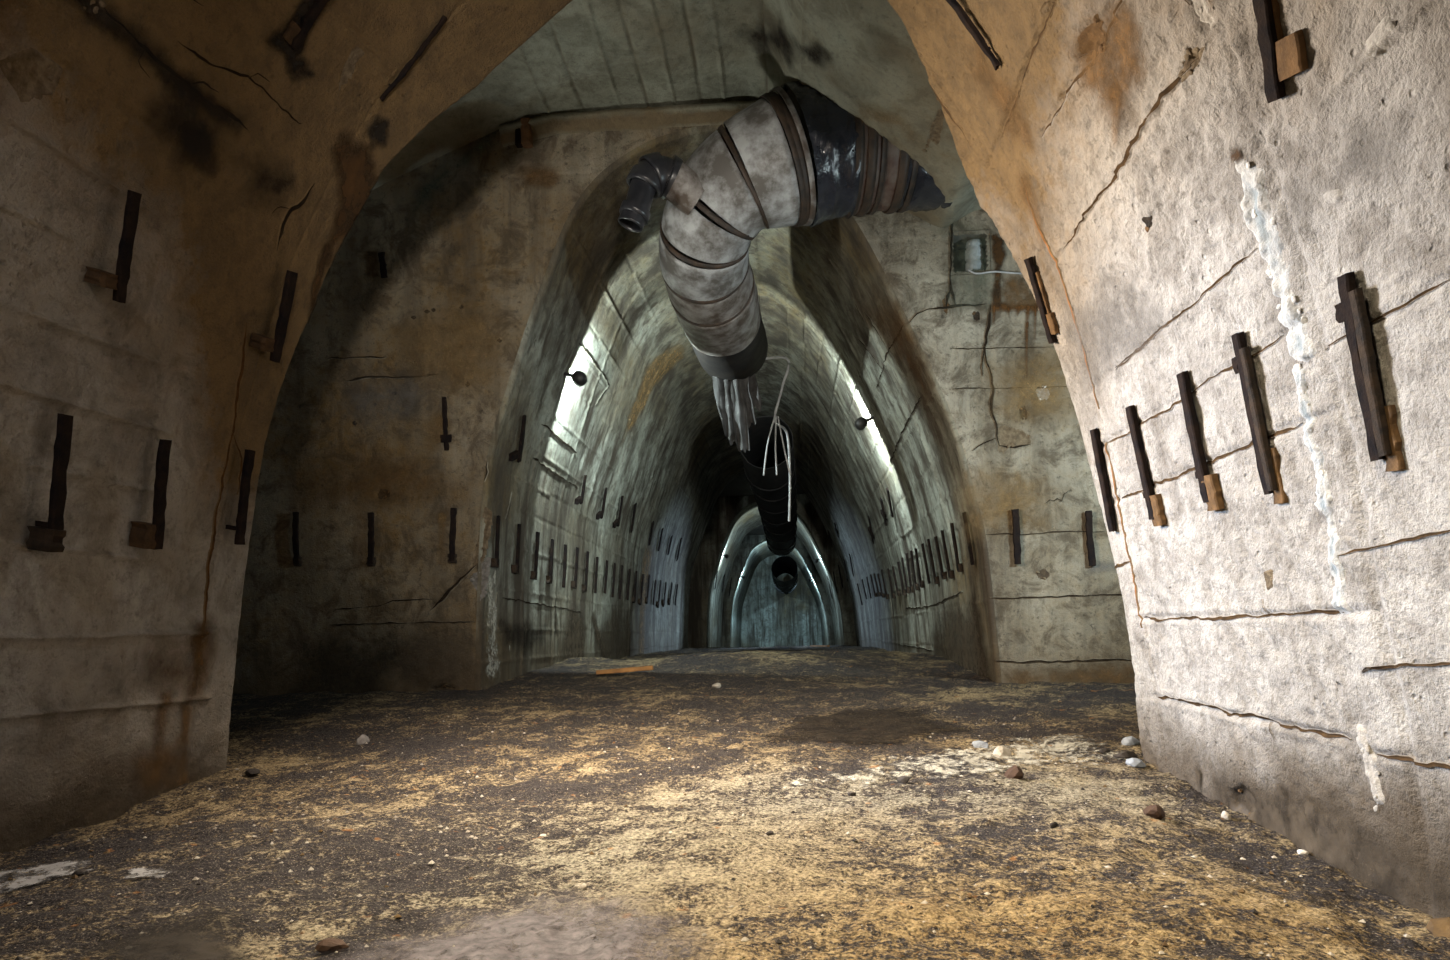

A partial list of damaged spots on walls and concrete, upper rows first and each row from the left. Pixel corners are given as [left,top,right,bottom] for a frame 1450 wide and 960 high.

crack [178,41,302,130]
corrosion [992,235,1038,365]
crack [857,0,1344,663]
water stain [1234,159,1354,615]
water stain [1356,723,1385,811]
water stain [0,860,91,892]